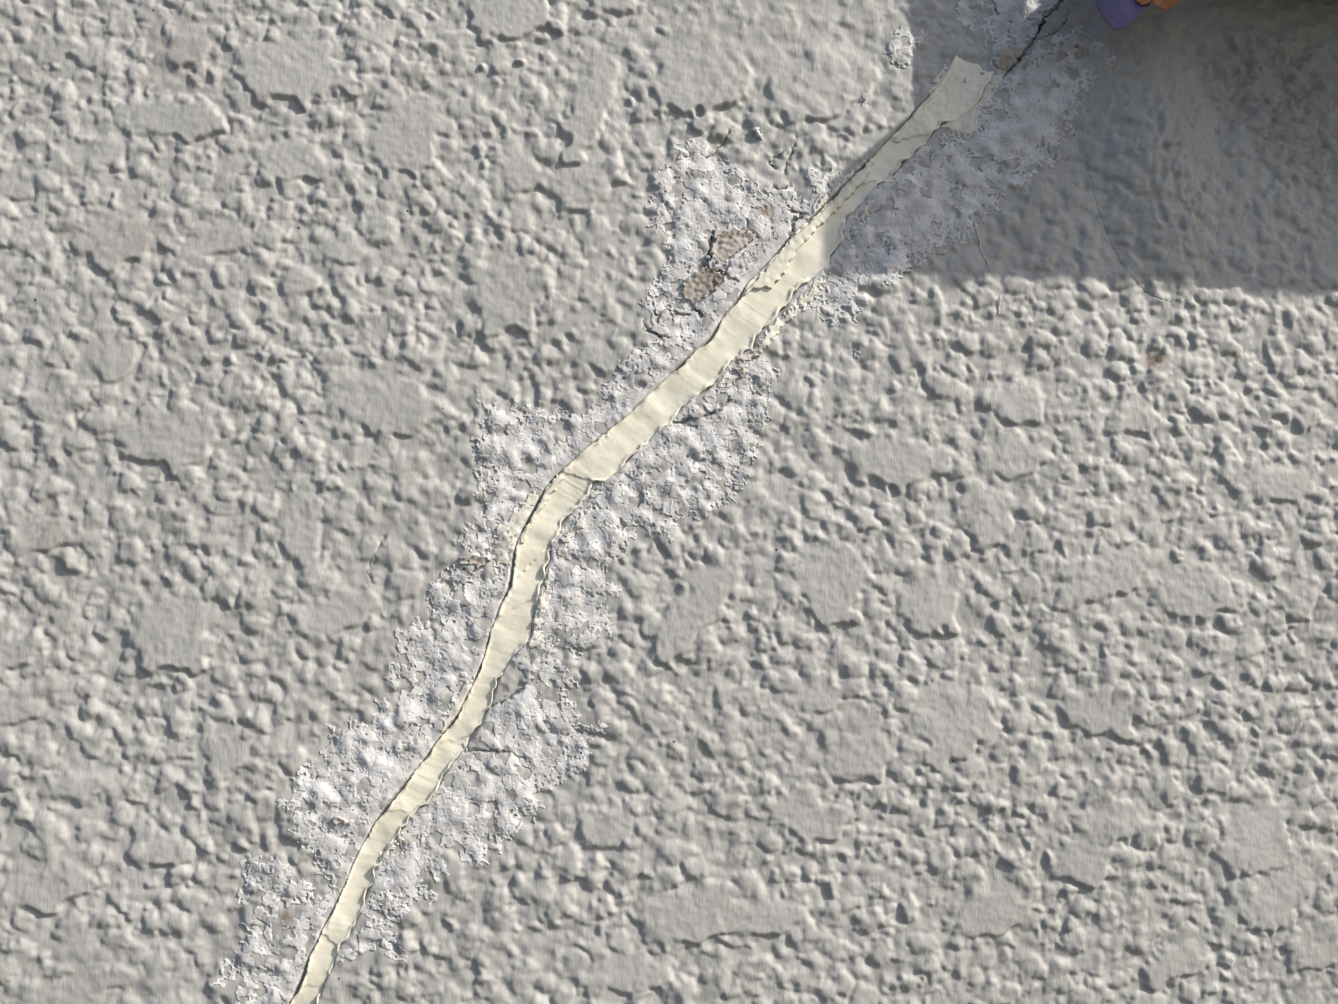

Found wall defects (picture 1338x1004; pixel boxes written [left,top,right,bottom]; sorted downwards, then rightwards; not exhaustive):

peeling [208,139,848,1004]
crack [290,0,1070,1004]